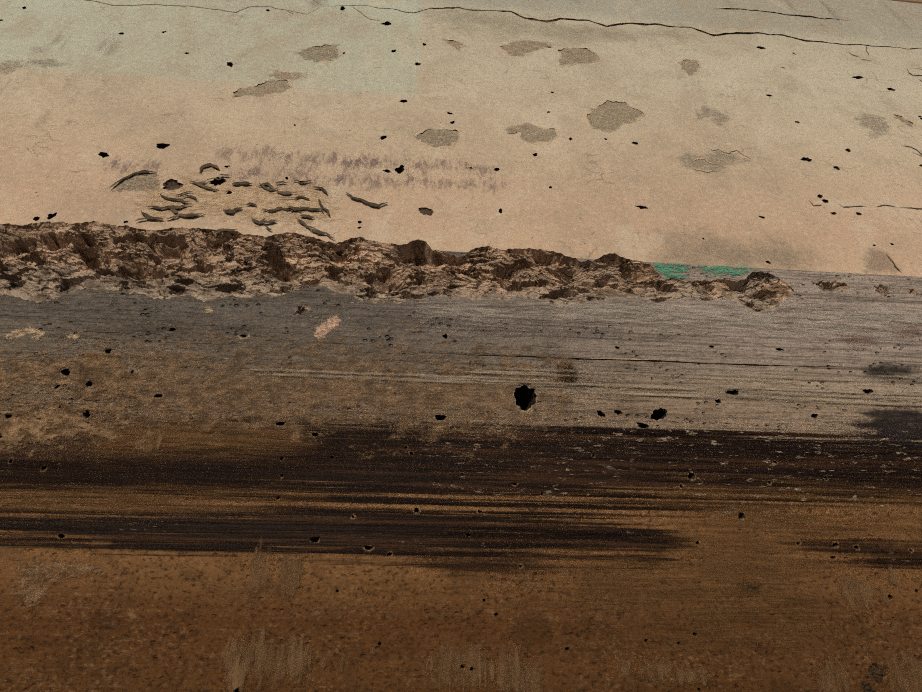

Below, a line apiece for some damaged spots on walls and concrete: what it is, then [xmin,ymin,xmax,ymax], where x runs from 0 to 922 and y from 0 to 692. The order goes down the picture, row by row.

peeling [297,44,343,64]
crack [90,0,922,80]
peeling [496,40,602,67]
peeling [228,70,304,98]
peeling [582,99,647,132]
peeling [415,128,462,149]
peeling [506,123,560,145]
spalling [0,221,794,316]
leakage [395,369,614,393]
leakage [0,375,922,630]